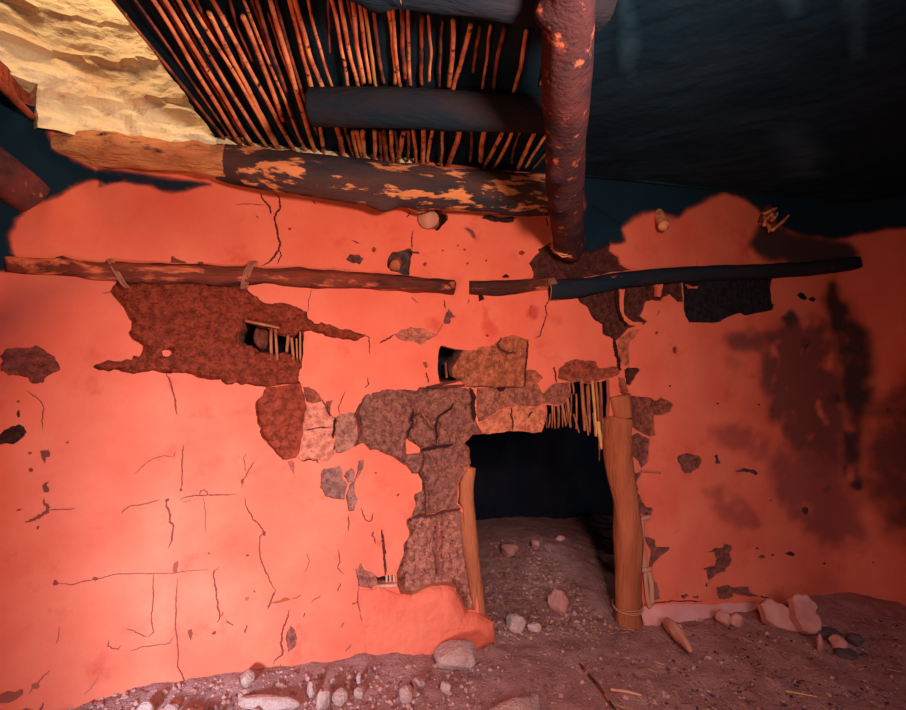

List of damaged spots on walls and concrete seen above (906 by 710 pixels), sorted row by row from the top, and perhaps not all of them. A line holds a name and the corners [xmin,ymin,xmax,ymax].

crack [238,193,282,266]
spalling [529,241,652,280]
spalling [0,346,60,384]
crack [166,373,177,414]
spalling [93,281,365,511]
spalling [558,279,774,515]
spalling [0,424,26,444]
crack [25,499,75,523]
crack [121,446,362,666]
crack [347,508,387,575]
spalling [706,543,758,599]
crack [59,567,247,681]